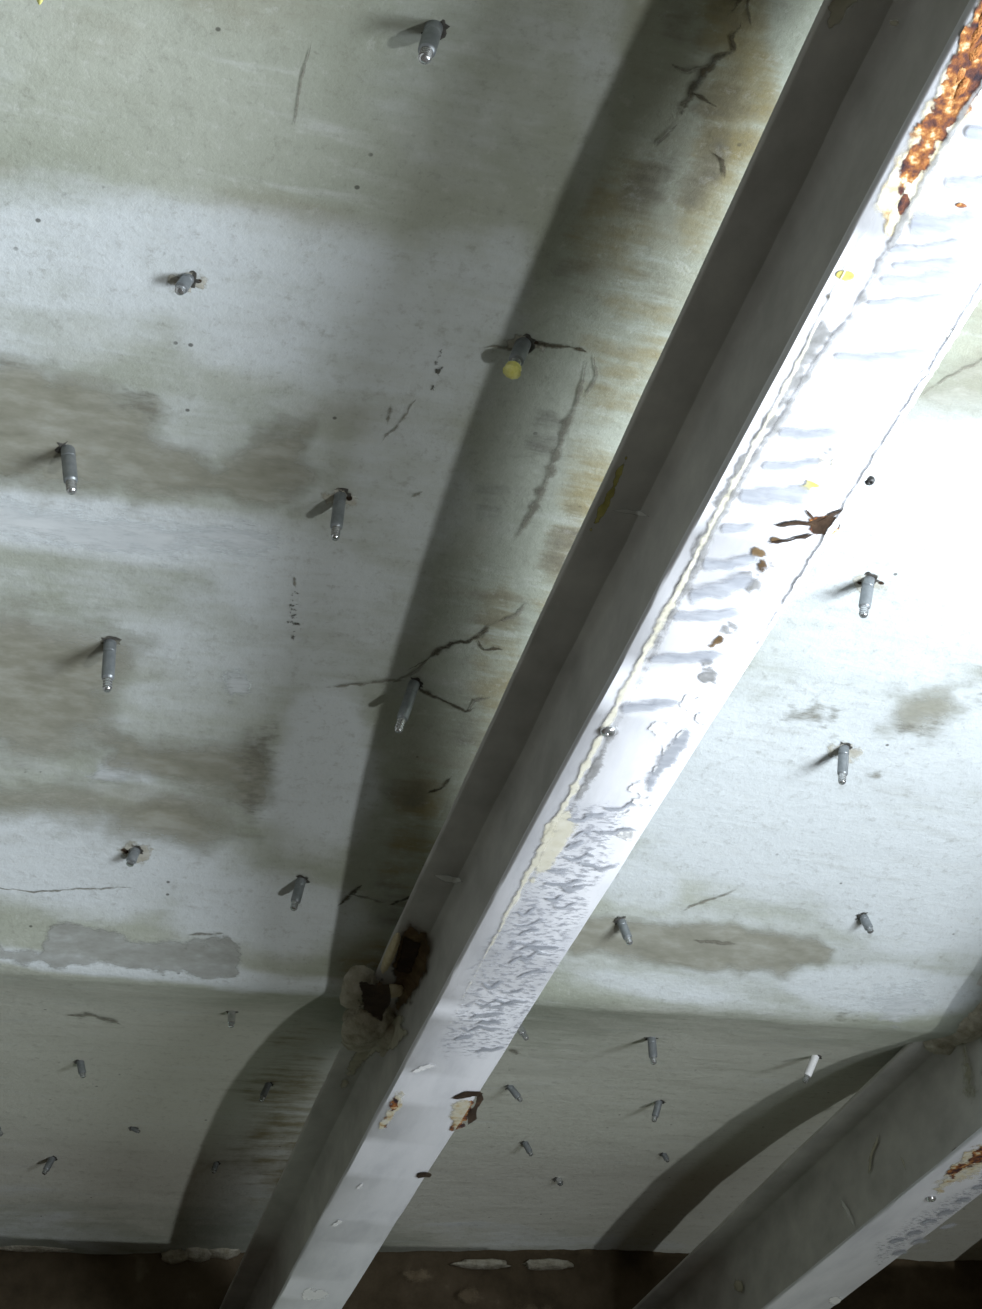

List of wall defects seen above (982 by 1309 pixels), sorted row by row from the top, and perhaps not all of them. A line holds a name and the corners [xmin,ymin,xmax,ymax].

crack [657,0,751,145]
corrosion [877,0,982,236]
damp [0,366,311,502]
crack [489,341,598,531]
corrosion [740,509,843,593]
crack [335,606,524,713]
corrosion [699,622,738,684]
damp [0,622,268,805]
peeling [0,922,241,979]
spalling [358,981,391,1021]
damp [570,918,832,975]
corrosion [934,1145,982,1193]